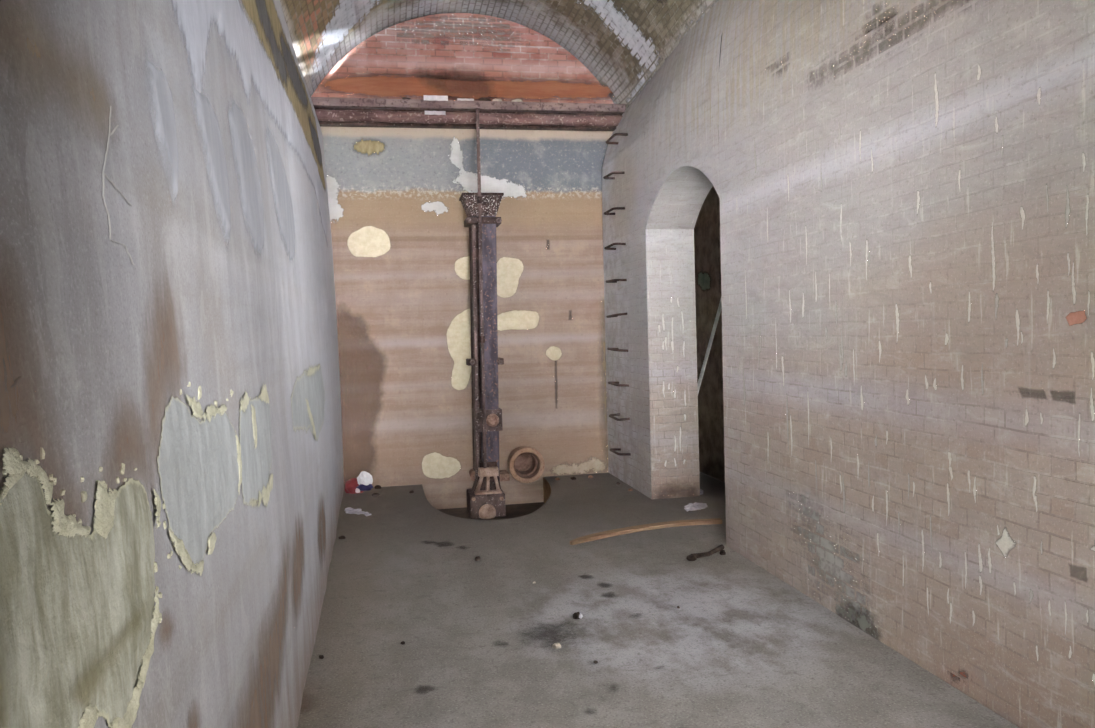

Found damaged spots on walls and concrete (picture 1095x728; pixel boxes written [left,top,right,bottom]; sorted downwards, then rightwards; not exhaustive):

peeling [347,226,391,257]
water stain [991,222,999,318]
peeling [446,308,471,390]
water stain [789,226,864,411]
water stain [337,310,385,485]
water stain [1078,352,1095,457]
peeling [422,452,461,479]
peeling [0,382,273,728]
water stain [965,544,992,595]